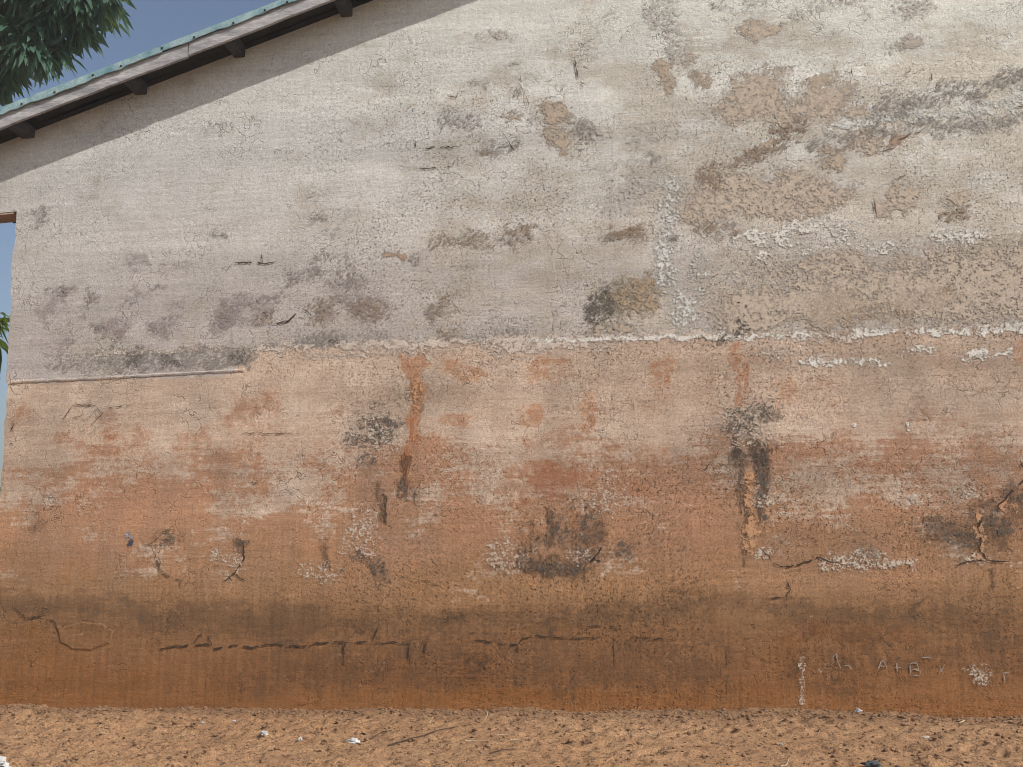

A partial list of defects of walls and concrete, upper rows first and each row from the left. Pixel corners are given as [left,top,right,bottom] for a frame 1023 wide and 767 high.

peeling [423,0,1023,368]
damp [581,270,664,342]
damp [715,308,750,345]
damp [479,466,636,576]
crack [956,460,1023,566]
crack [224,542,246,581]
crack [760,548,839,609]
crack [151,624,426,666]
damp [967,664,992,686]